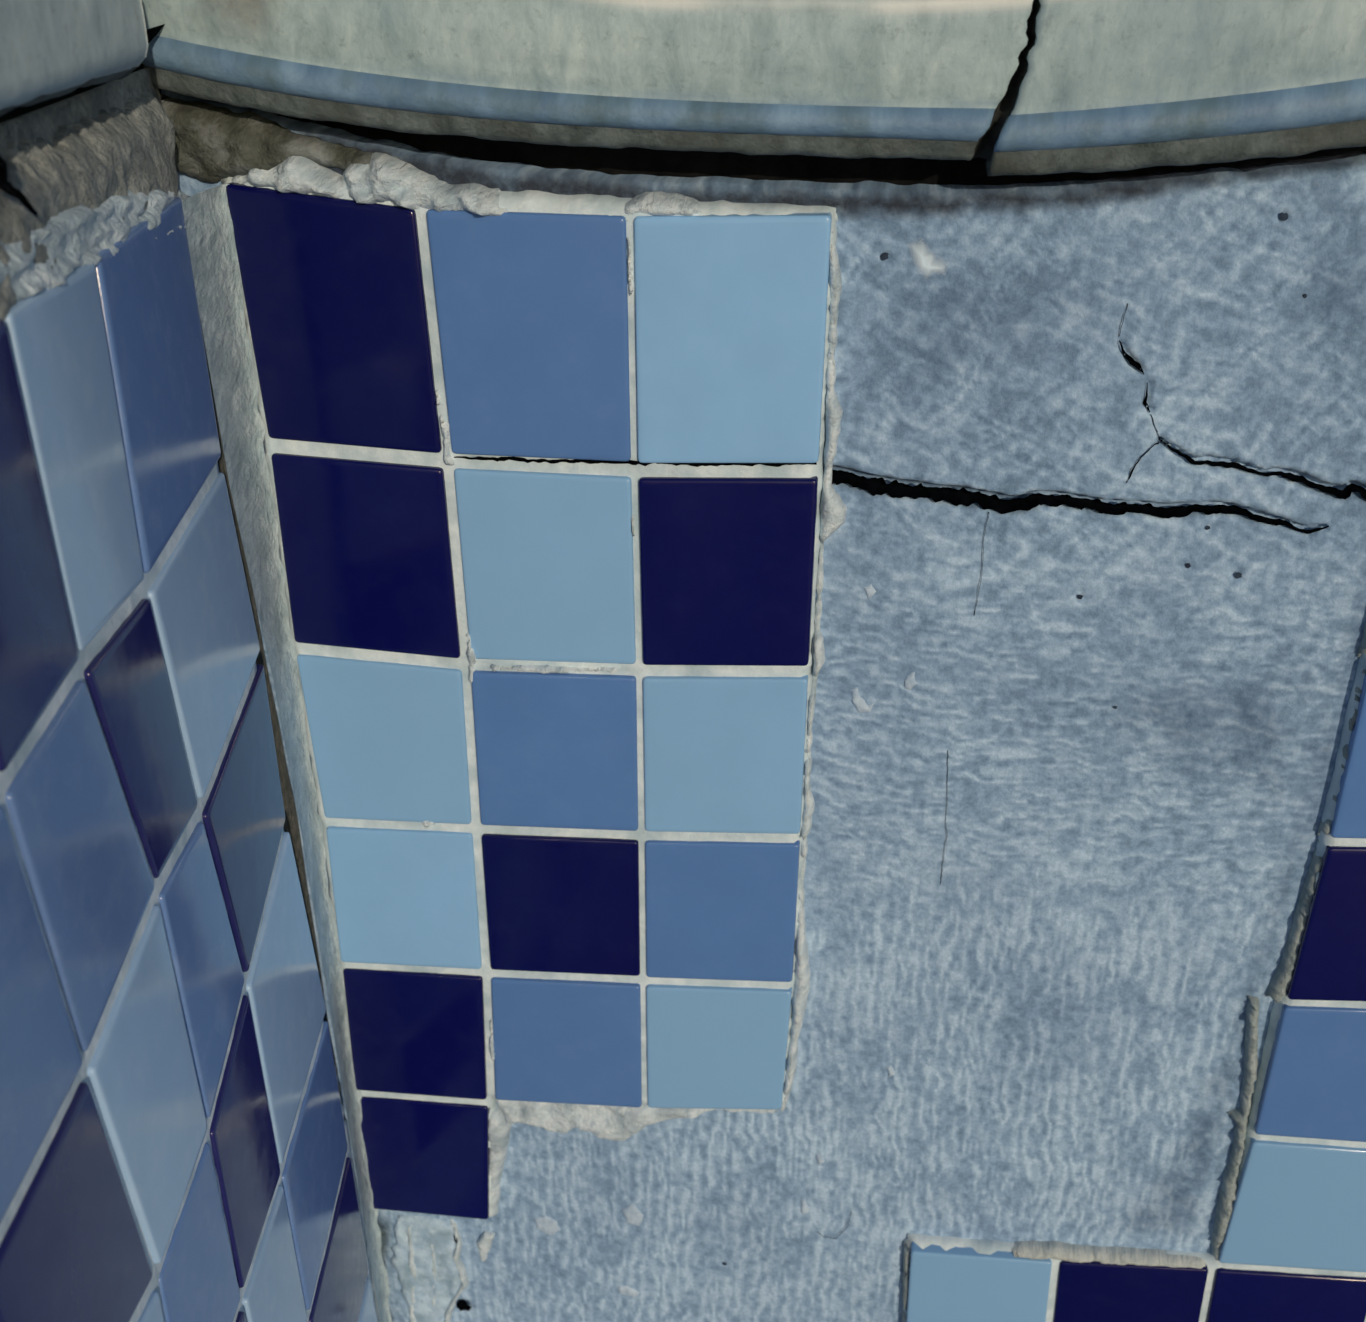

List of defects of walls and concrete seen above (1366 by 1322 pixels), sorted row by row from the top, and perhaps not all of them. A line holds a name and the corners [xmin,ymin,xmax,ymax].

crack [0,24,165,217]
flaking render [177,173,222,196]
crack [202,0,1366,185]
crack [454,303,1366,615]
flaking render [256,606,371,1265]
peeling [390,1214,462,1322]
peeling [444,1218,469,1322]